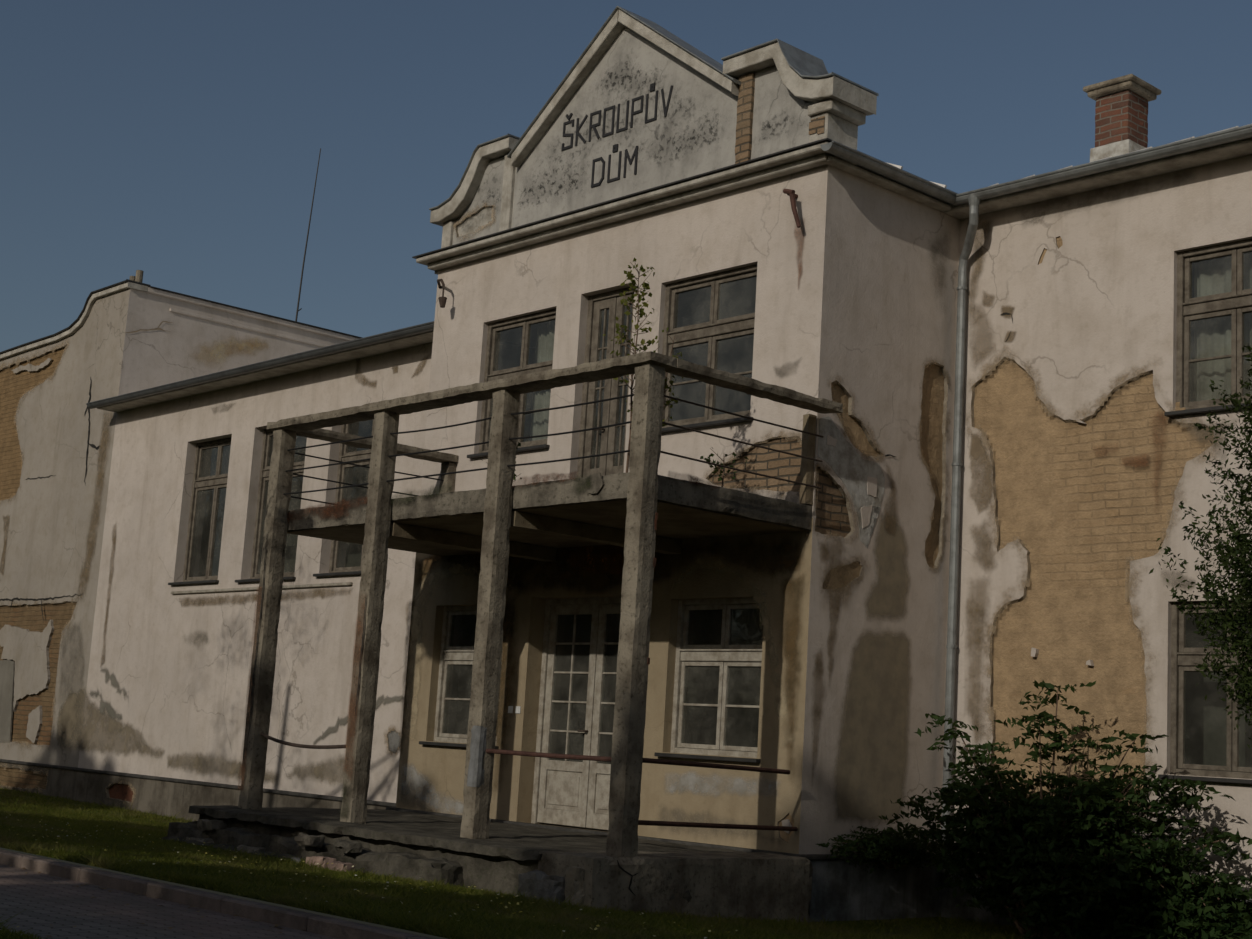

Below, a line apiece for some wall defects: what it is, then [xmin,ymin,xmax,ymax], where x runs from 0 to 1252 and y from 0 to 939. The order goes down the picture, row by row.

flaking render [977,296,1014,321]
flaking render [0,346,67,501]
crack [26,377,100,482]
flaking render [709,431,856,537]
flaking render [831,378,884,461]
flaking render [919,360,950,570]
flaking render [974,352,1220,816]
flaking render [0,601,77,747]
water stain [57,676,242,778]